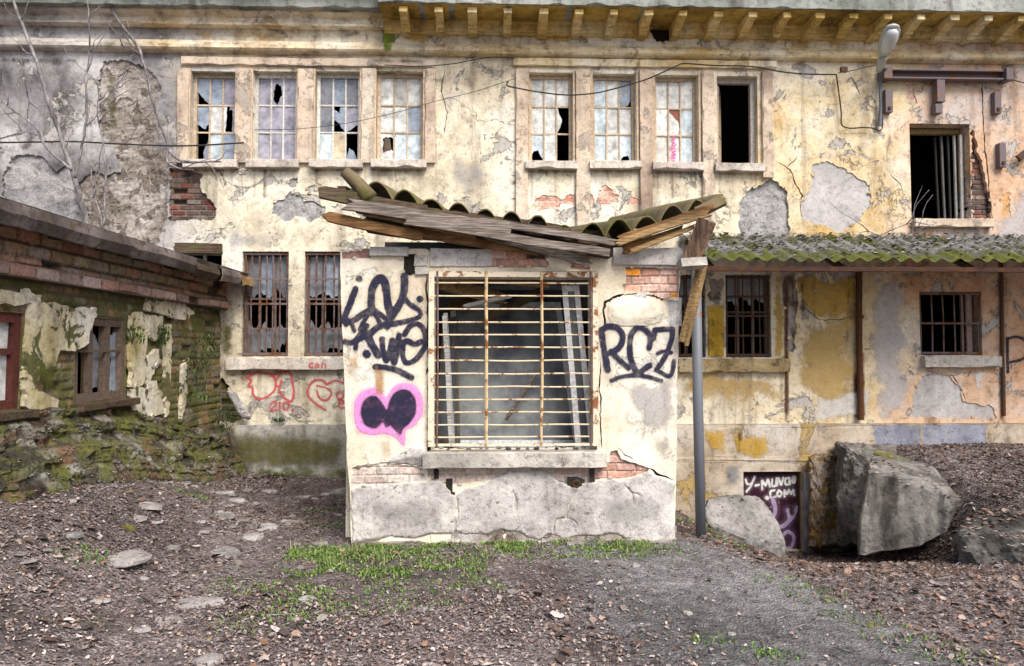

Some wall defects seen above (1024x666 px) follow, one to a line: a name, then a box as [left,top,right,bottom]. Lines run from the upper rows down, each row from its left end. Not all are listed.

flaking render [3,60,217,245]
spalling [272,175,325,222]
flaking render [531,194,576,212]
flaking render [590,185,640,206]
flaking render [738,161,872,237]
crack [983,149,991,216]
flaking render [623,265,682,329]
flaking render [0,288,97,410]
flaking render [125,298,195,422]
flaking render [911,371,996,421]
damp [223,428,339,465]